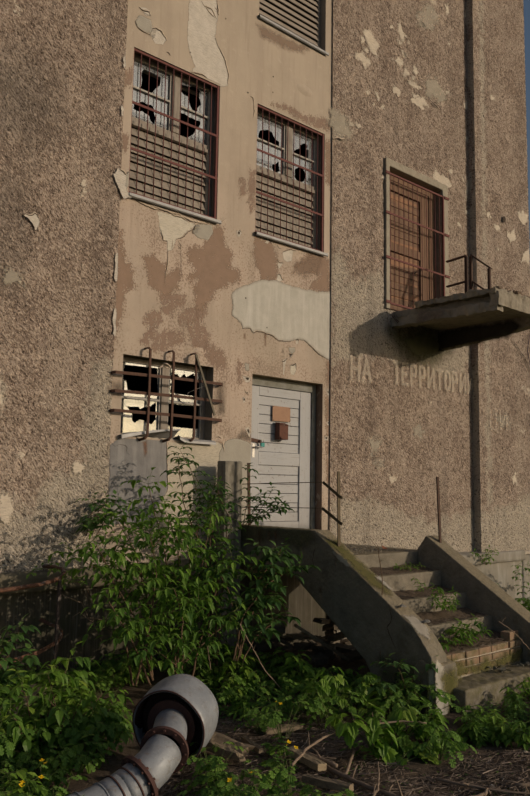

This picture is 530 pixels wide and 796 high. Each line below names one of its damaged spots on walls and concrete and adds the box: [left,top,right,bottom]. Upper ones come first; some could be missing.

flaking render [187,0,229,87]
spalling [355,29,380,70]
spalling [390,23,450,110]
spalling [24,211,40,230]
flaking render [158,211,195,251]
flaking render [277,248,296,282]
spalling [399,604,431,639]